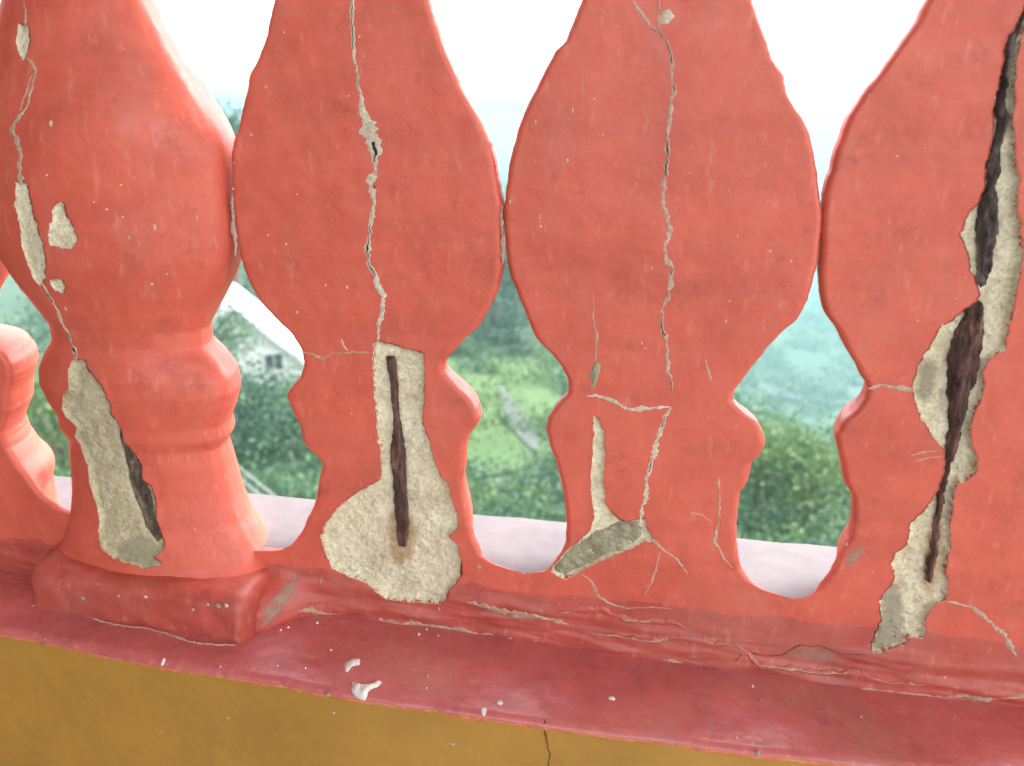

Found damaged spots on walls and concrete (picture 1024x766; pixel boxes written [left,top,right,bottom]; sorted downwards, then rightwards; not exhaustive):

peeling [16,24,30,60]
crack [10,57,37,185]
peeling [13,182,78,293]
crack [42,283,78,360]
crack [302,0,387,360]
crack [581,0,688,609]
spalling [871,10,1024,654]
spalling [62,360,165,570]
spalling [320,341,462,610]
spalling [551,416,655,580]
crack [861,688,1024,702]
crack [947,601,1017,656]